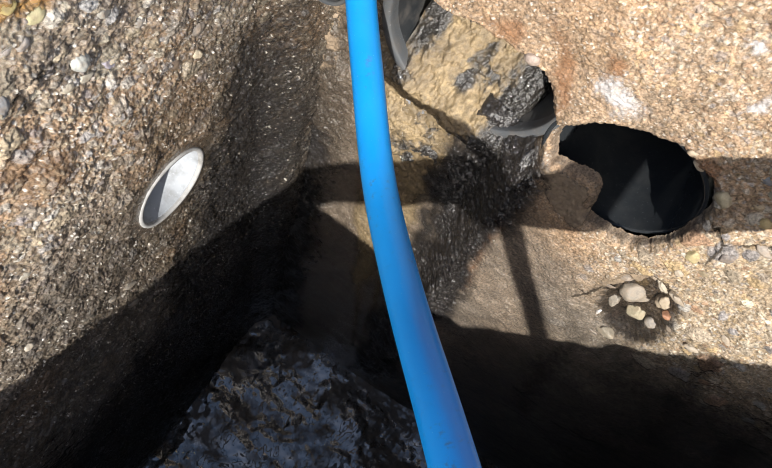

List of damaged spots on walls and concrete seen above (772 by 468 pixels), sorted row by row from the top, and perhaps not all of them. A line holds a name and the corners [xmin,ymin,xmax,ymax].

leakage [74,0,330,468]
leakage [350,180,400,384]
leakage [392,99,546,321]
crack [705,222,772,266]